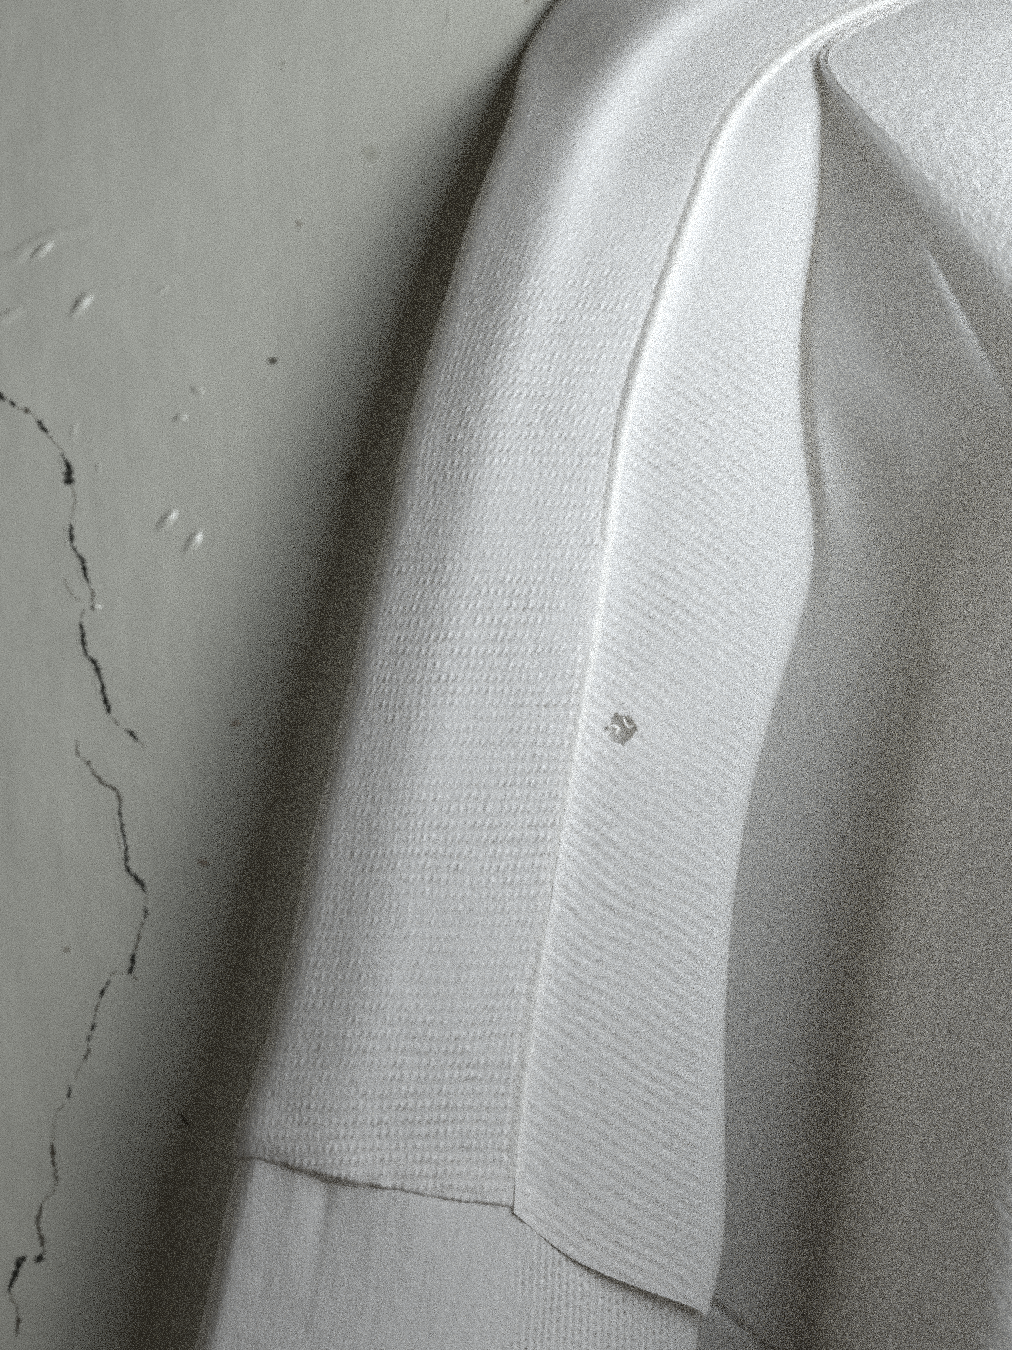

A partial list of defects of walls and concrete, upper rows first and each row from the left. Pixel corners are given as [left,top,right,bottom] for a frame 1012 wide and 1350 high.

crack [0,392,144,746]
crack [2,739,148,1338]